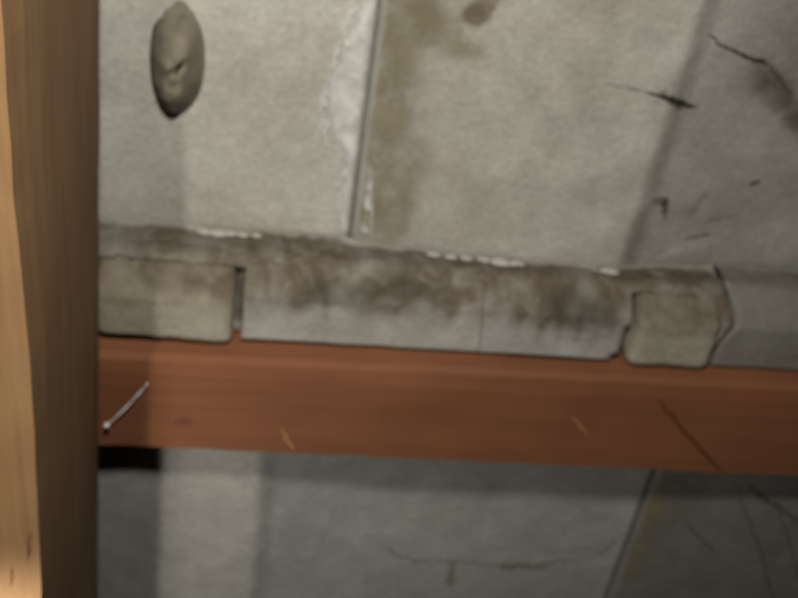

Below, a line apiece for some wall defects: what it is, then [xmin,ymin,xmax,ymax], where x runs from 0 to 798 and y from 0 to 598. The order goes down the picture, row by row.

crack [709,34,790,93]
crack [615,85,695,108]
damp [426,252,526,266]
damp [591,267,620,275]